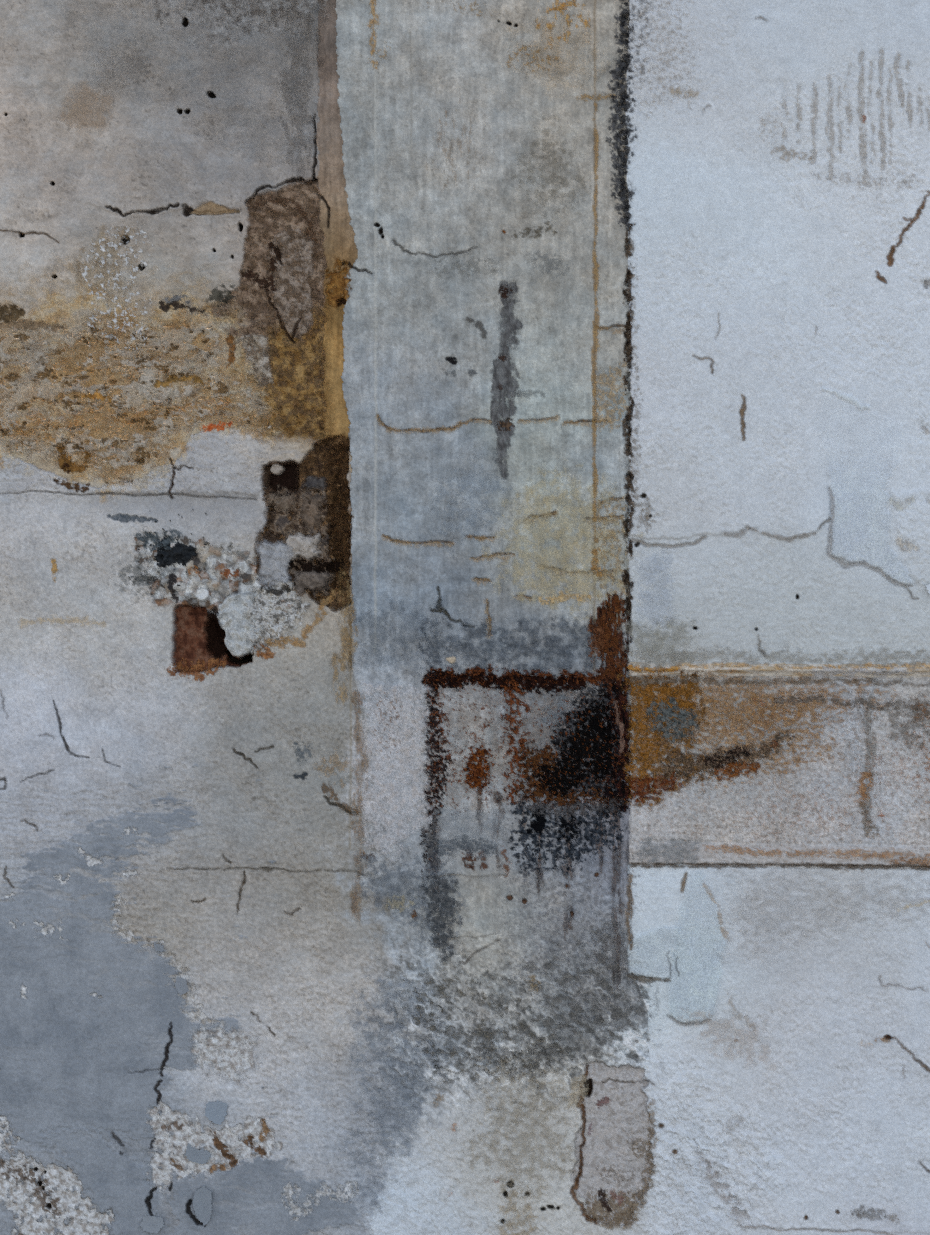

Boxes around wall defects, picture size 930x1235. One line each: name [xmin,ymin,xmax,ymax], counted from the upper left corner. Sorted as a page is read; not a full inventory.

crack [107,204,203,217]
crack [245,120,330,223]
spalling [0,182,354,681]
damp [445,281,545,479]
corrosion [420,129,930,984]
crack [0,700,119,789]
damp [421,818,501,871]
peeling [628,884,728,1026]
spalling [0,1116,114,1235]
crack [145,1182,205,1227]
peeling [146,1100,282,1226]
spalling [570,1062,657,1229]